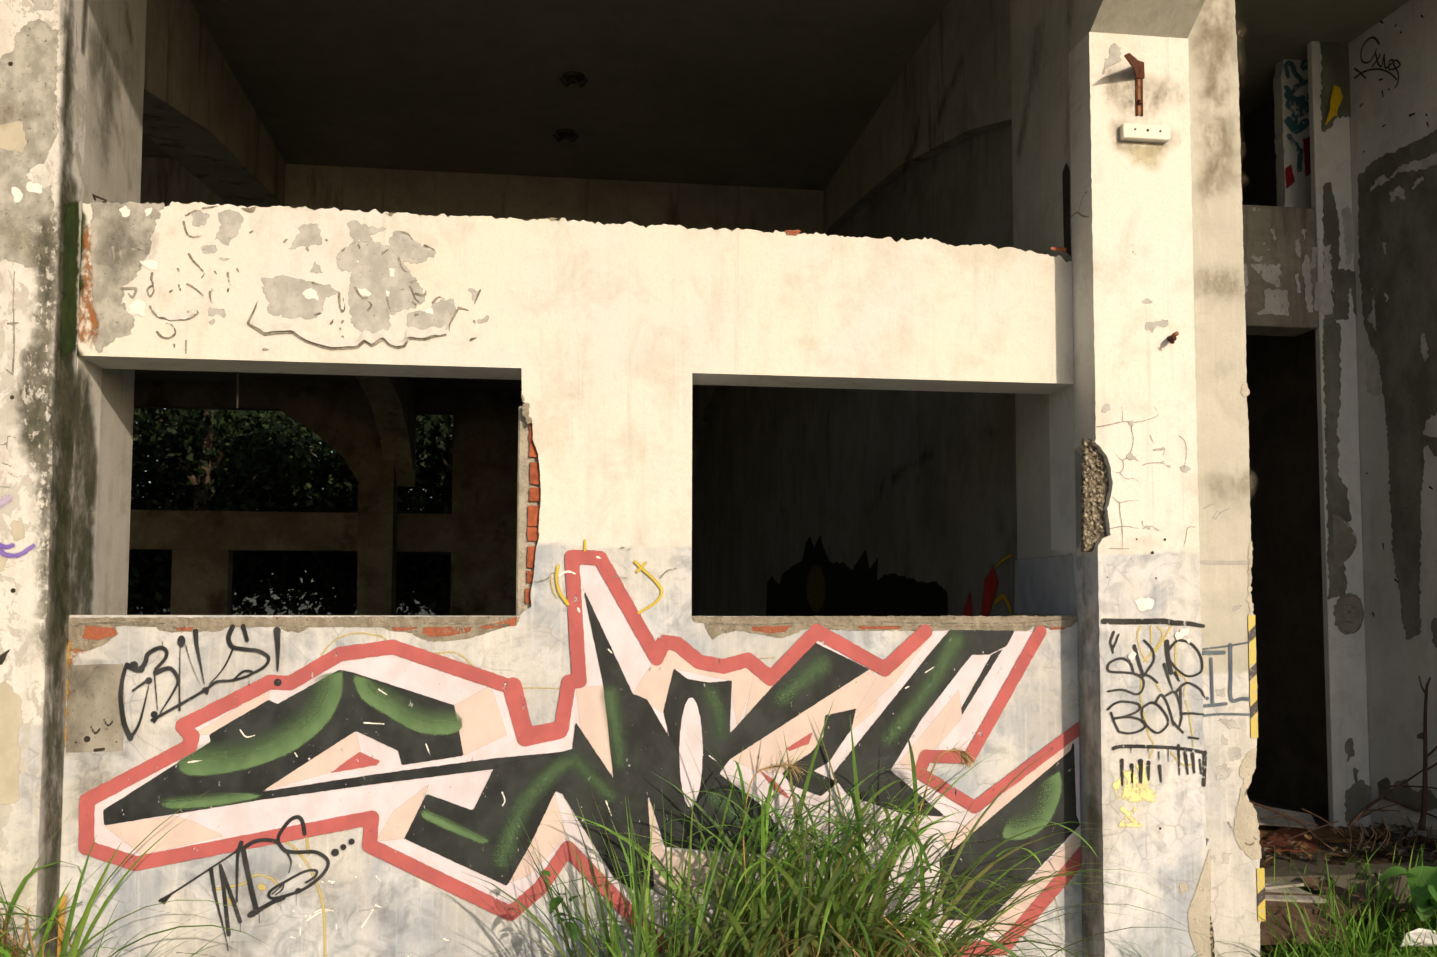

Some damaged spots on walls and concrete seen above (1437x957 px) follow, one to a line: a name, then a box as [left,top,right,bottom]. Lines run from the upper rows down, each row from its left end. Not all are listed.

peeling [0,0,59,268]
peeling [1320,41,1363,132]
water stain [89,201,165,353]
peeling [146,206,256,354]
peeling [247,212,489,351]
peeling [1243,113,1437,647]
water stain [10,0,113,957]
spalling [68,385,541,650]
spalling [1081,438,1109,552]
crack [1097,406,1228,549]
peeling [0,682,22,805]
spalling [1179,718,1262,957]